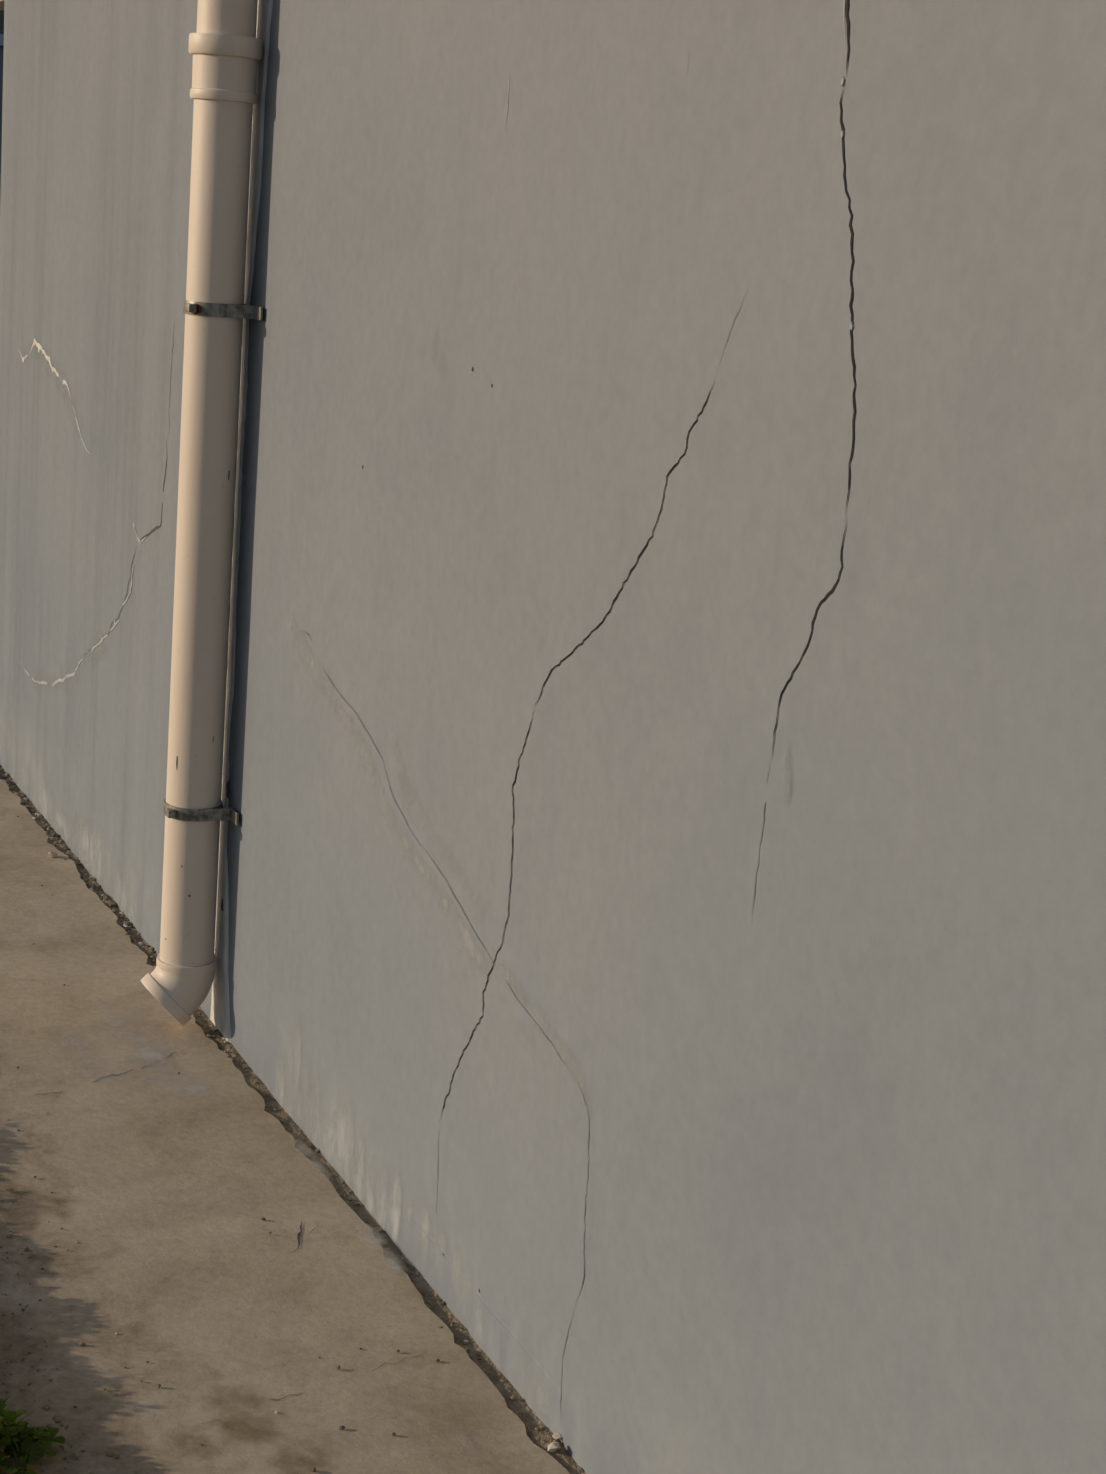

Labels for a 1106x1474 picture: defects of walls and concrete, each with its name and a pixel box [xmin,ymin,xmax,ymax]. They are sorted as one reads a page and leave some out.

crack [18,328,174,701]
crack [746,0,875,1044]
crack [430,298,743,1221]
crack [288,1222,319,1252]
crack [560,1075,597,1419]